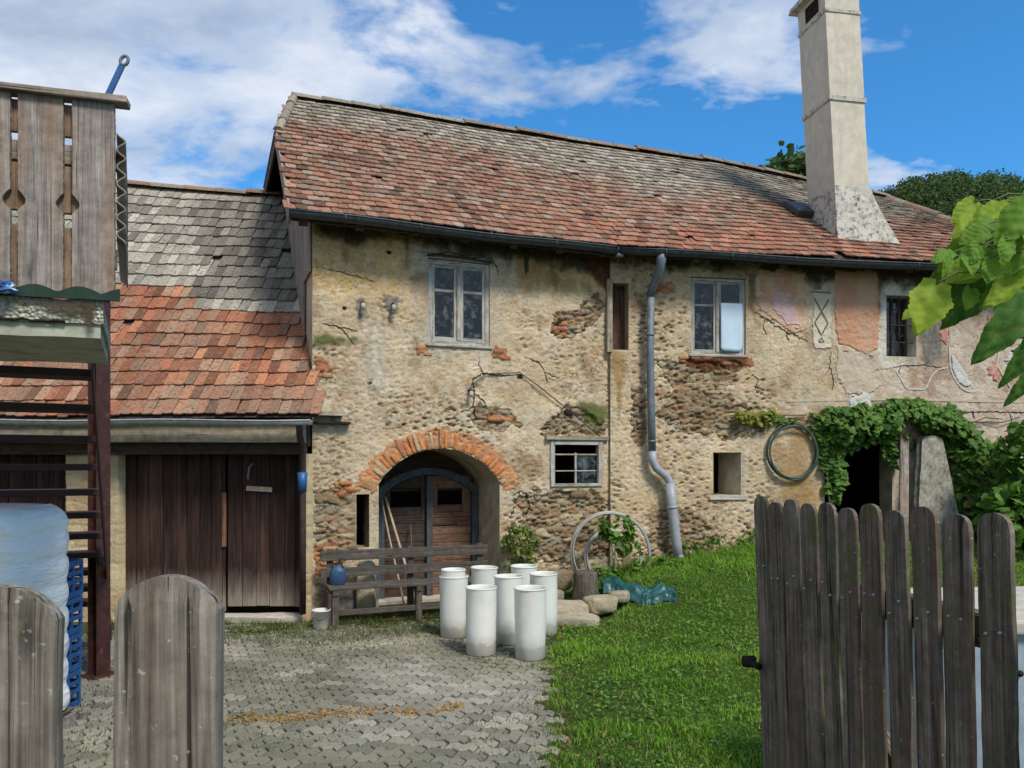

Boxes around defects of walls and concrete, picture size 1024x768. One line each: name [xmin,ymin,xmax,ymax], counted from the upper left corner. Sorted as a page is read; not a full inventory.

spalling [550,292,604,339]
crack [757,312,806,340]
peeling [834,270,881,411]
crack [466,357,559,429]
spalling [630,355,769,447]
spalling [313,403,611,576]
spalling [645,506,719,557]